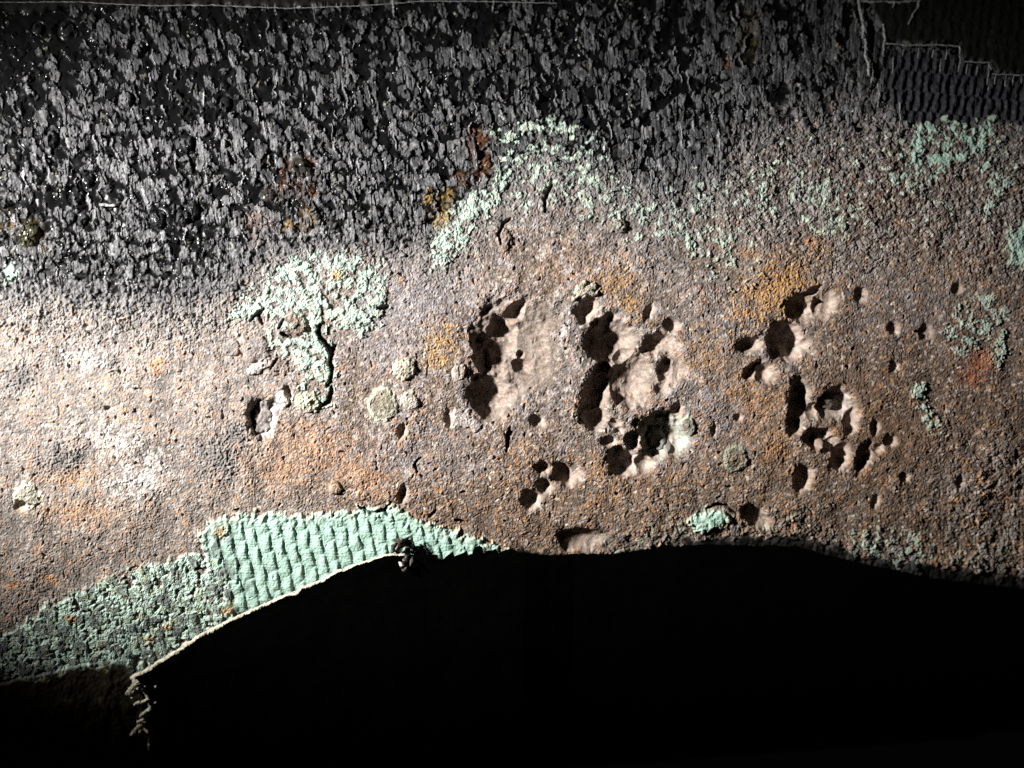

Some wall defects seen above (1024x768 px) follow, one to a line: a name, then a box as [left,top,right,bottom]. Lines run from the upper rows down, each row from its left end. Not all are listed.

hole [521,459,587,510]
hole [458,287,693,481]
rust [574,248,674,329]
hole [793,463,815,493]
hole [735,283,902,476]
rust [673,220,1010,511]